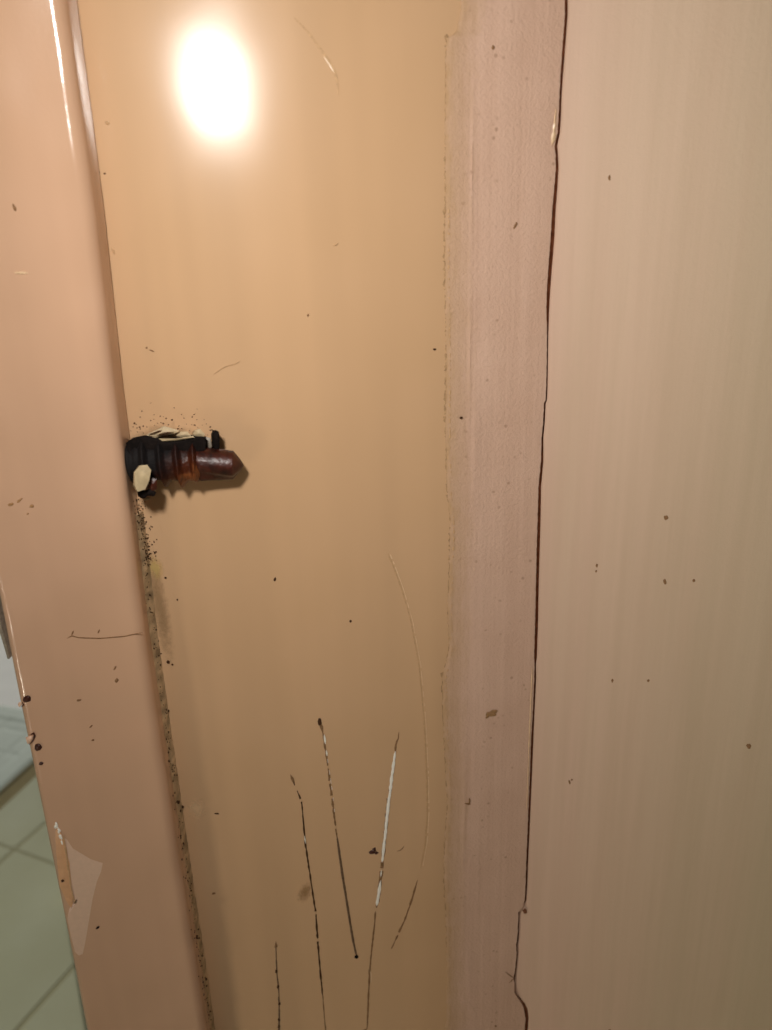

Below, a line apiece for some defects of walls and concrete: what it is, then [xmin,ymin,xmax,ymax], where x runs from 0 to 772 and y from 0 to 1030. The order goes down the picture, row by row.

peeling [54,822,103,955]
crack [506,0,568,1030]